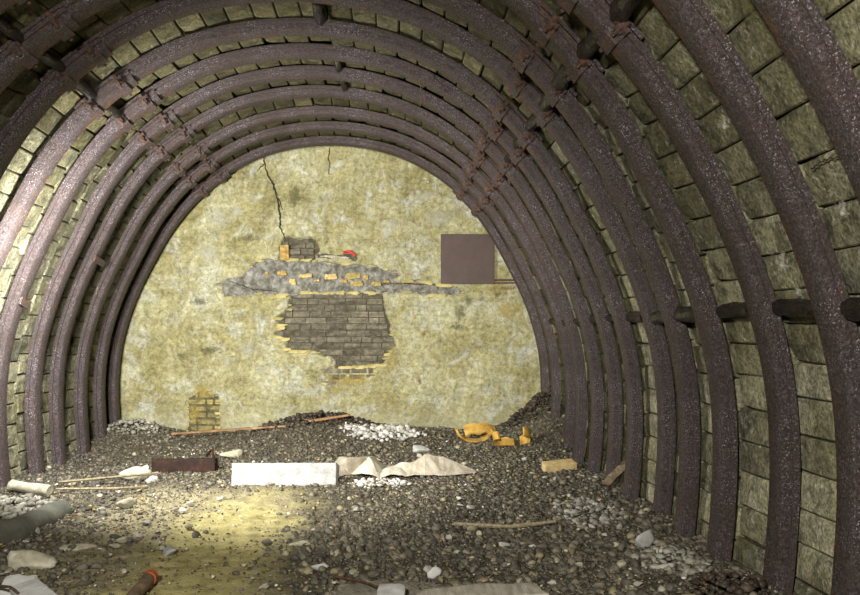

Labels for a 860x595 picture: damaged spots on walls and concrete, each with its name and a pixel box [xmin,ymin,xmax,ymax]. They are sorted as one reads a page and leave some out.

crack [259,157,286,240]
flaking render [215,237,464,385]
flaking render [186,390,223,431]